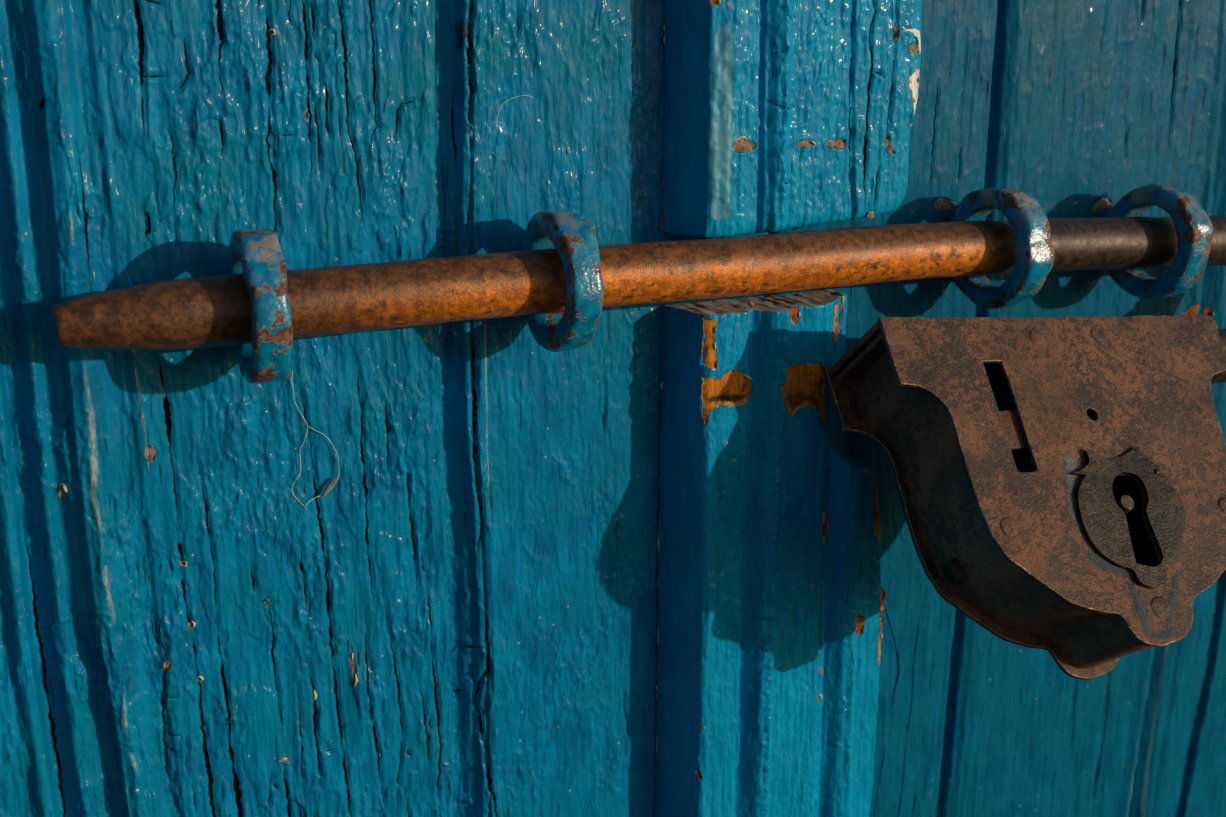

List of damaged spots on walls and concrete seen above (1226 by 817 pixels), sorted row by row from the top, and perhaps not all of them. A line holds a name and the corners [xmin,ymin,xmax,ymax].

crack [133,0,164,135]
crack [258,0,394,231]
peeling [732,136,758,153]
peeling [797,137,847,150]
crack [849,0,897,217]
peeling [893,22,921,125]
crack [470,321,484,549]
peeling [700,317,752,426]
peeling [781,362,826,420]
peeling [833,296,844,353]
crack [158,355,442,817]
crack [27,545,66,817]